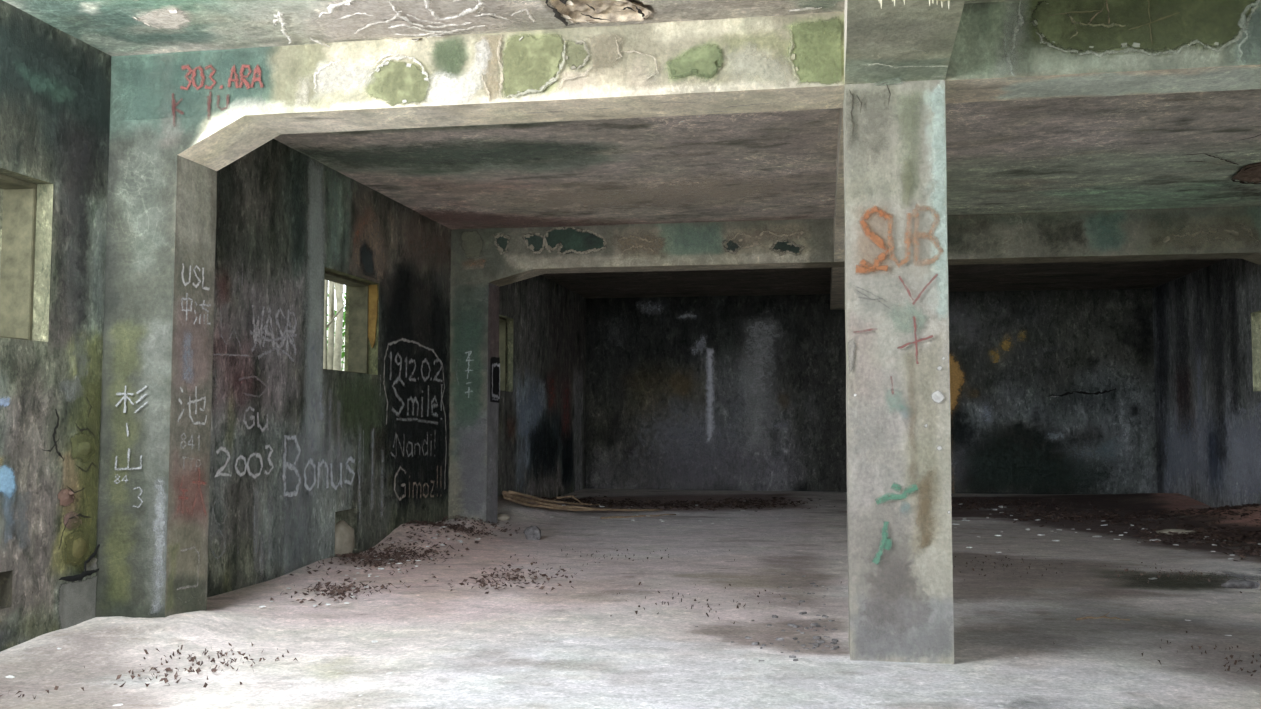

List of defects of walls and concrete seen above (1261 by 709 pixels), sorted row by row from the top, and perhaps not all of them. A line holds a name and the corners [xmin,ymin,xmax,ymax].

peeling [273,12,292,44]
peeling [1031,0,1259,57]
peeling [310,0,723,106]
spalling [1186,153,1261,196]
peeling [493,227,607,255]
leakage [694,337,714,441]
crack [1050,388,1116,397]